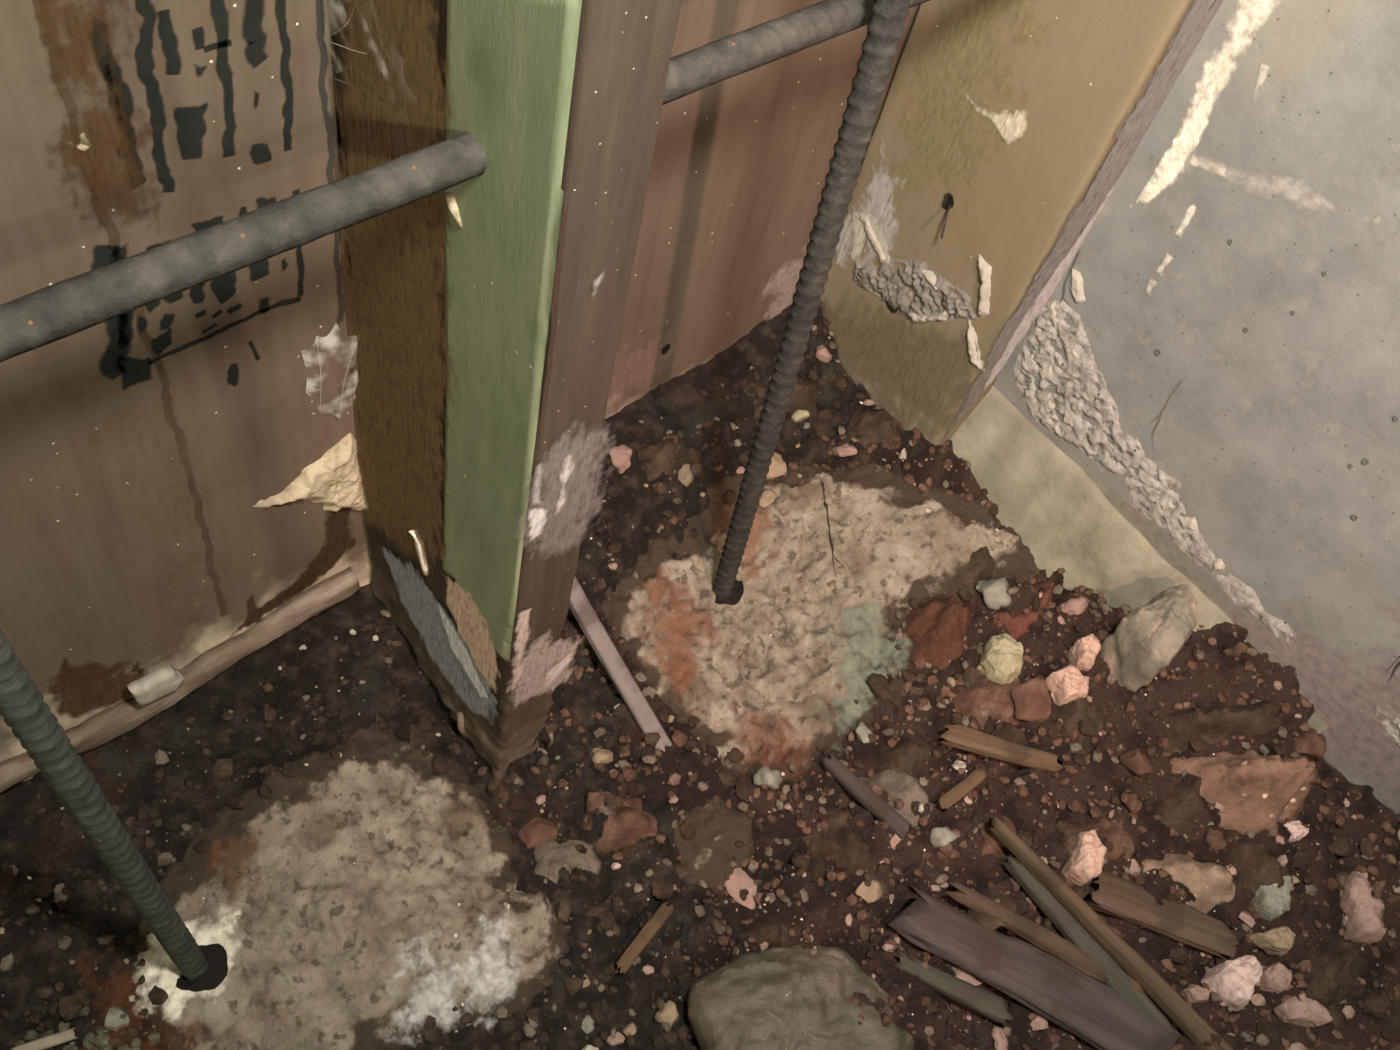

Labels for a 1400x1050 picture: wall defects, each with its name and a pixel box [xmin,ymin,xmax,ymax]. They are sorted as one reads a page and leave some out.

spalling [0,131,487,362]
spalling [1013,269,1297,650]
spalling [0,629,208,982]
crack [1386,656,1400,683]